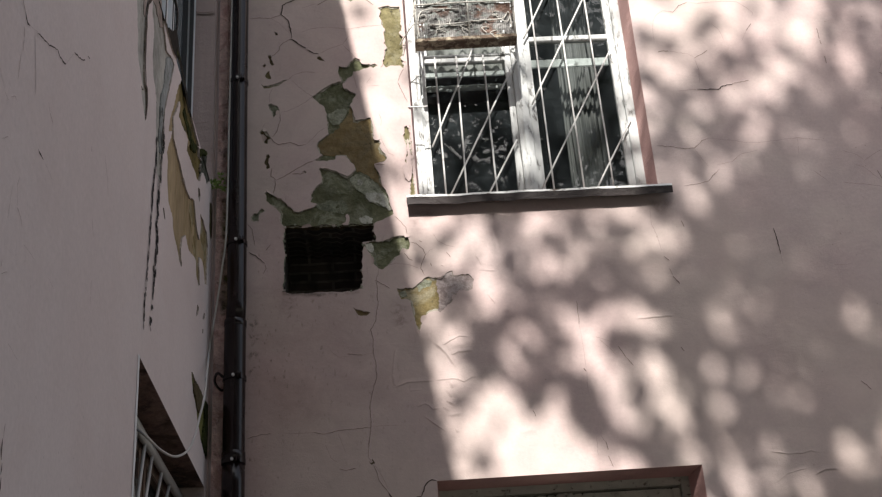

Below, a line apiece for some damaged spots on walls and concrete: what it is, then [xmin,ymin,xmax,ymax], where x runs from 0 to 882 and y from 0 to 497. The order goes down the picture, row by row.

crack [18,0,90,90]
crack [250,0,408,102]
crack [652,1,753,91]
spalling [137,0,211,280]
spalling [251,6,410,294]
spalling [403,124,415,195]
spalling [397,271,474,335]
crack [247,216,453,497]
spalling [192,377,208,459]